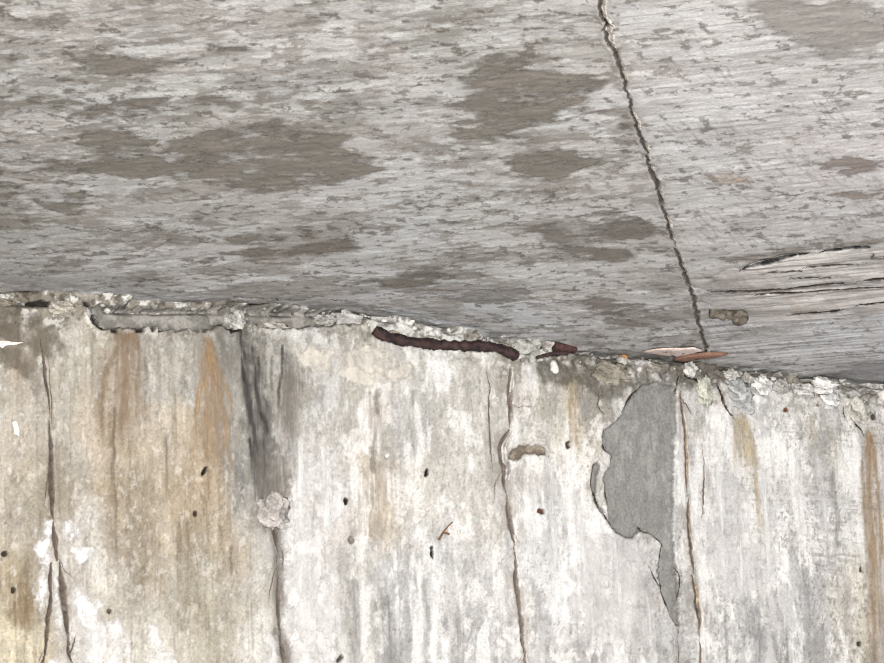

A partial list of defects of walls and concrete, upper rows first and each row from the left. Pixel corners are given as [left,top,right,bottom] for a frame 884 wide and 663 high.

damp [48,120,383,193]
damp [450,53,607,141]
crack [598,0,884,352]
spalling [83,302,340,333]
spalling [371,326,520,361]
damp [34,520,62,626]
crack [38,339,76,663]
damp [259,441,355,663]
crack [486,365,528,663]
spalling [590,381,679,626]
crack [590,375,734,663]
corrosion [862,431,883,573]